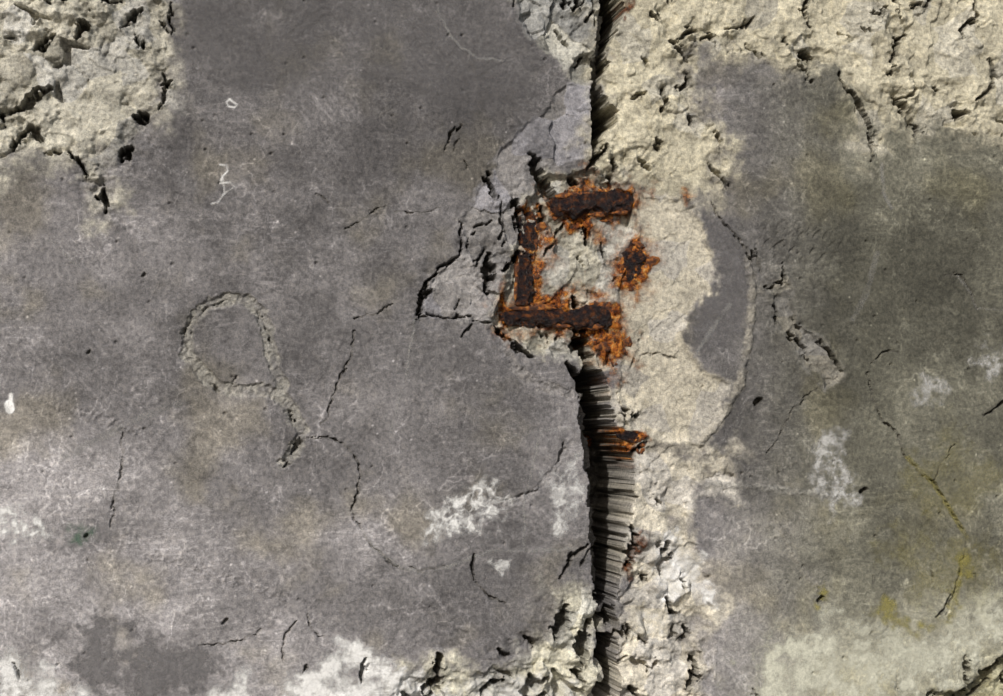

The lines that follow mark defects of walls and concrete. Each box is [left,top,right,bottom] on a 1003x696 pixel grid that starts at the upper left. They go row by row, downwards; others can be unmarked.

spalling [0,0,176,211]
crack [711,202,750,252]
corrosion [515,179,639,367]
corrosion [612,238,660,292]
crack [460,324,474,338]
corrosion [495,294,517,338]
spalling [405,0,1003,696]
crack [303,303,446,574]
corrosion [584,427,648,460]
crack [866,350,978,618]
crack [470,553,507,605]
crack [559,543,590,580]